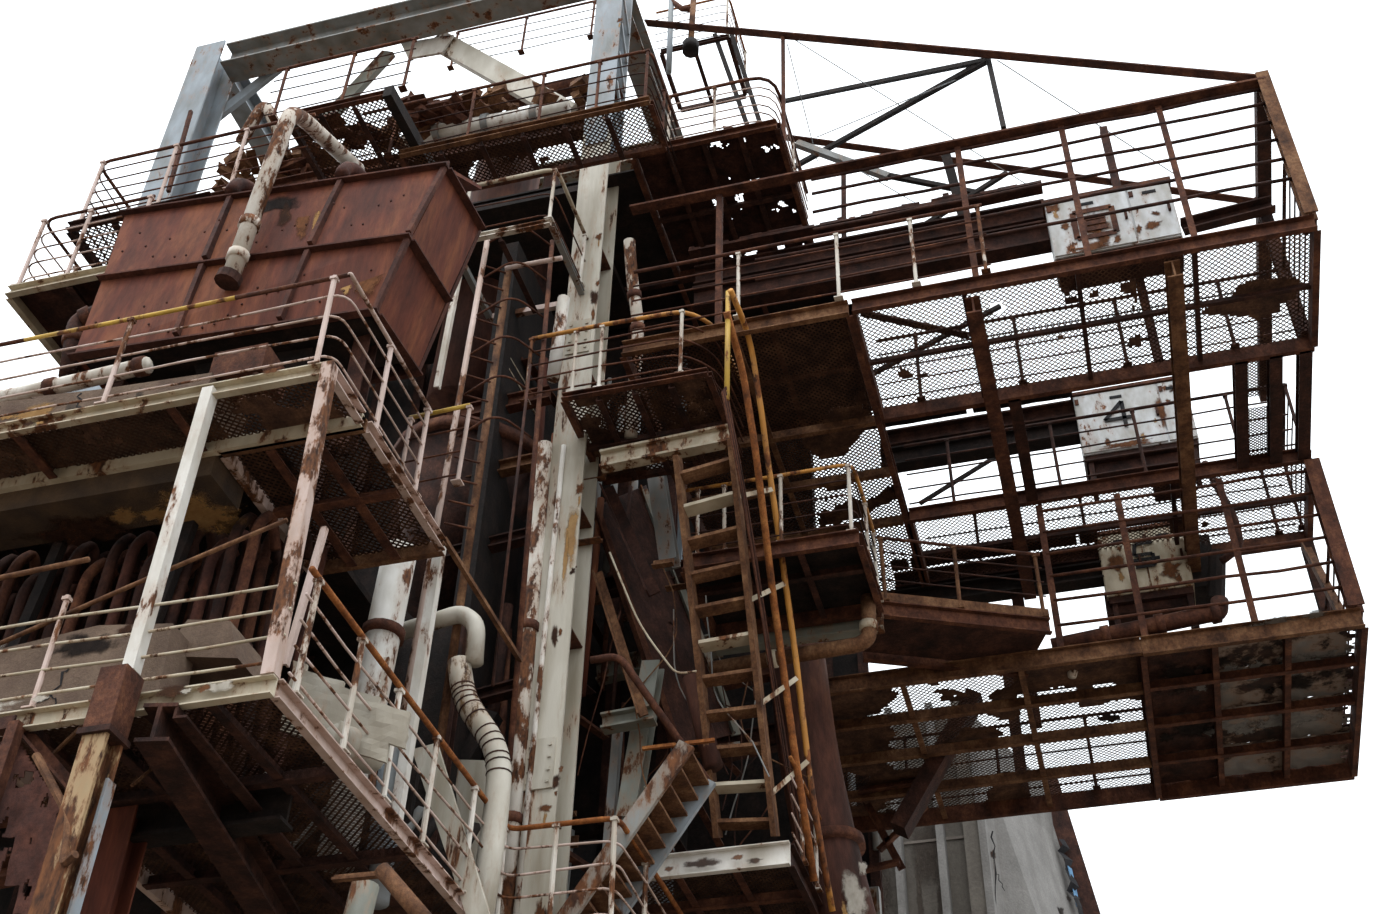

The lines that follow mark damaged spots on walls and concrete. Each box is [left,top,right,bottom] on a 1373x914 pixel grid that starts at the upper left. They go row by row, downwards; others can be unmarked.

corrosion [264,197,320,239]
corrosion [1045,204,1121,253]
corrosion [1136,211,1162,233]
corrosion [1101,385,1173,450]
corrosion [562,484,584,581]
corrosion [1155,561,1182,582]
corrosion [551,626,562,647]
peeling [1227,610,1325,630]
peeling [181,680,232,693]
peeling [1205,707,1342,736]
corrosion [540,766,563,823]
peeling [842,862,867,914]